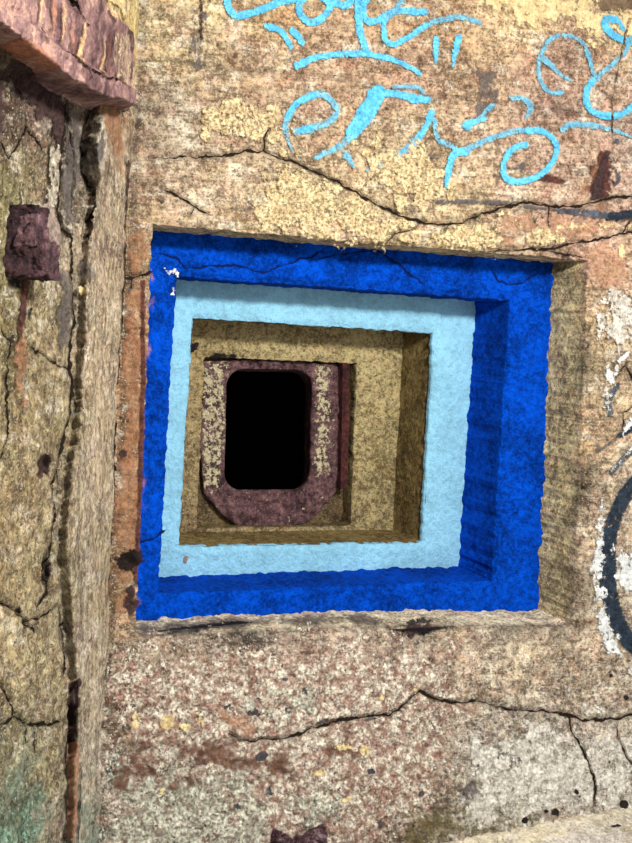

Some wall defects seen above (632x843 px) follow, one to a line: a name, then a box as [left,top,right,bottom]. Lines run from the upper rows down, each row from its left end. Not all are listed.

rust [0,37,60,74]
rust [39,0,87,60]
crack [70,0,90,26]
crack [41,27,131,125]
peeling [106,0,137,17]
rust [556,149,619,231]
crack [118,129,632,373]
crack [0,104,97,676]
rust [113,231,151,616]
peeling [602,351,630,417]
crack [0,685,64,752]
crack [231,690,632,809]